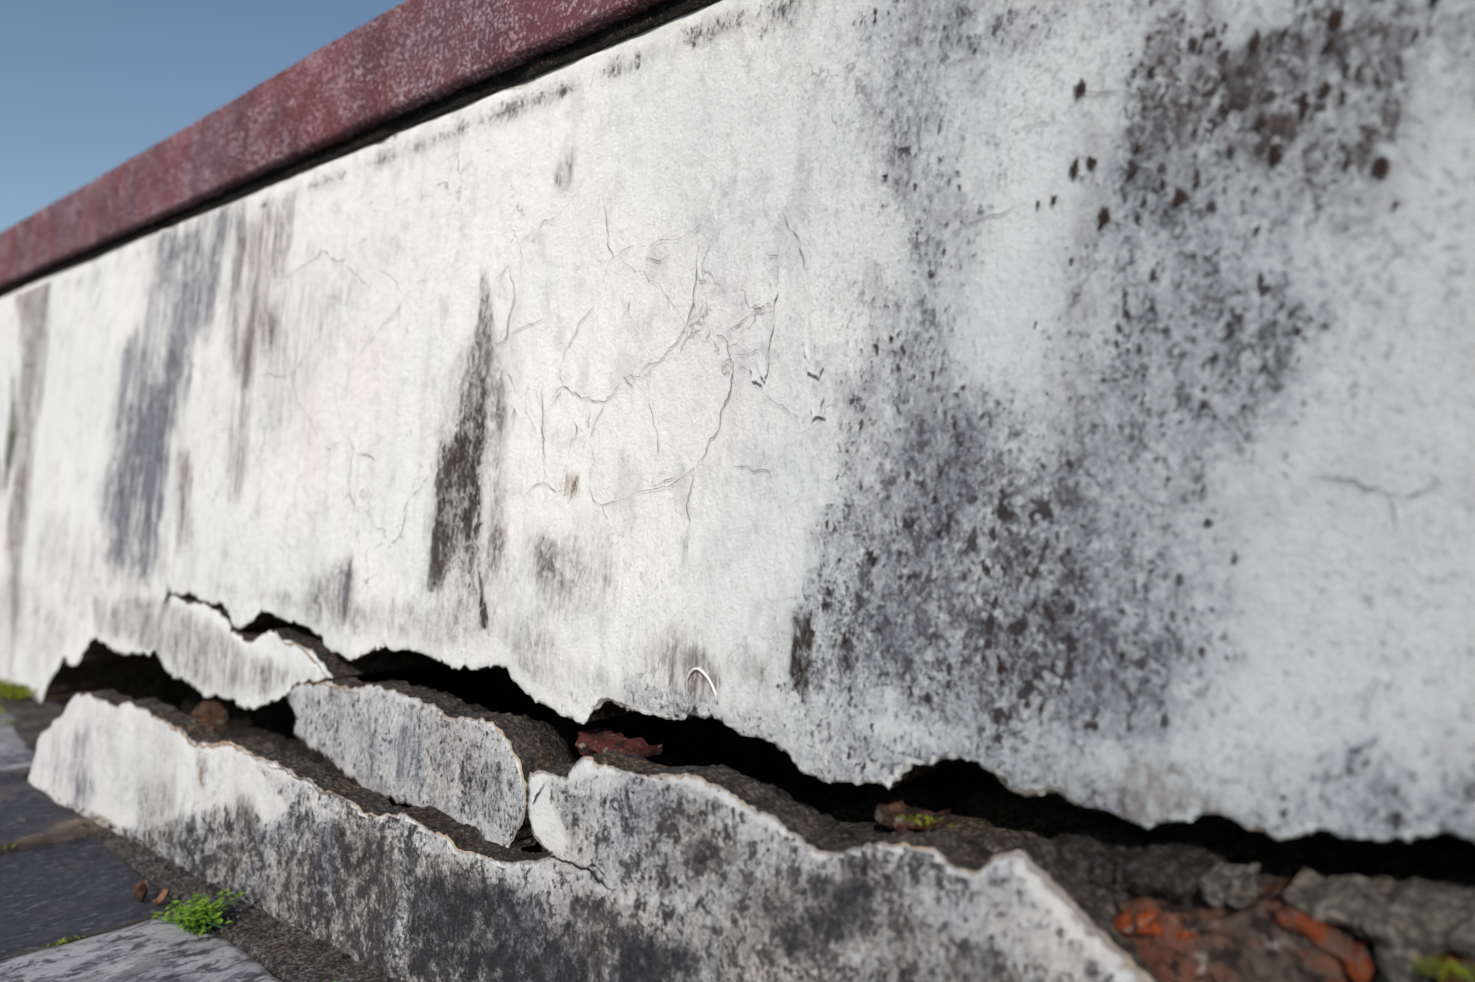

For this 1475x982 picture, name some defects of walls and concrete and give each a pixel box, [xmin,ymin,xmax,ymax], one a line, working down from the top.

water stain [415,79,574,152]
water stain [0,282,49,640]
crack [495,181,805,520]
water stain [624,0,1475,820]
water stain [66,170,1114,982]
crack [156,638,421,809]
crack [517,840,613,891]
crack [409,665,1074,856]
crack [1048,848,1233,912]
spalling [822,783,1475,982]
water stain [1245,736,1475,838]
crack [1414,831,1475,850]